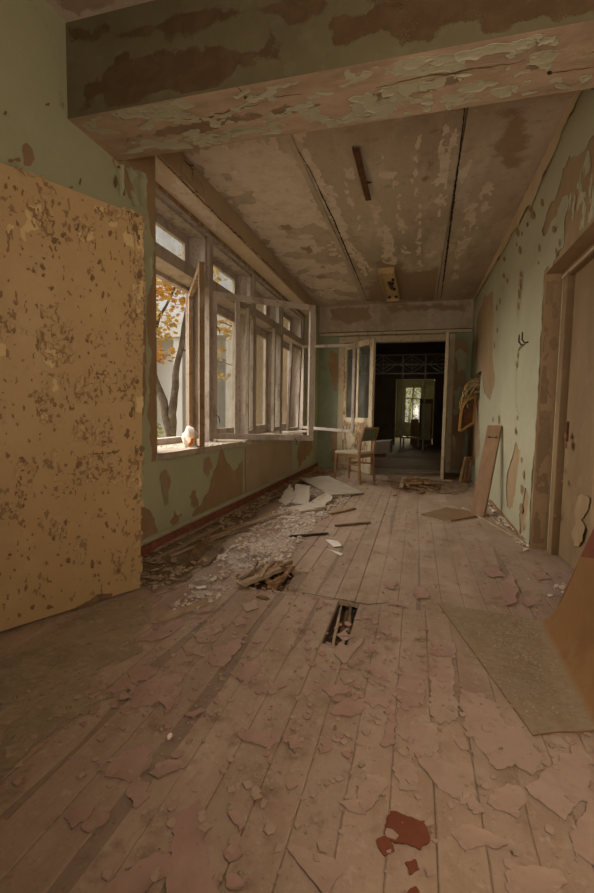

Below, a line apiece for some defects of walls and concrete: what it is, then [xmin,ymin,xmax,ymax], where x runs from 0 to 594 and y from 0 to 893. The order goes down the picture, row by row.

peeling [6,204,42,241]